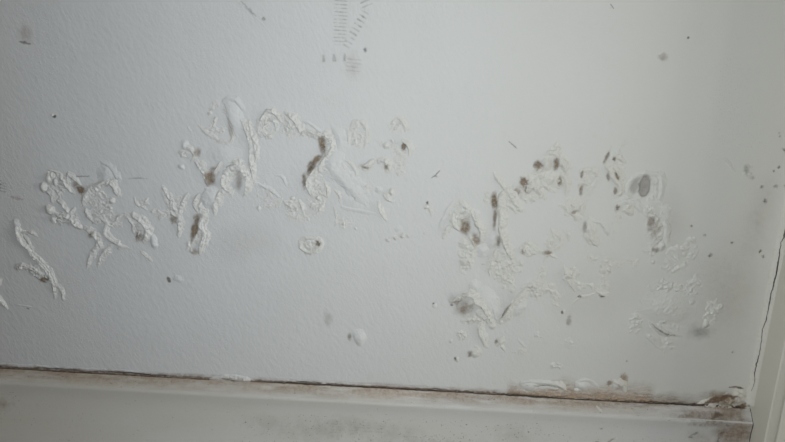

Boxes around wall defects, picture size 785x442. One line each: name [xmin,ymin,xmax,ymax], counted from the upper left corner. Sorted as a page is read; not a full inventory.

crack [1,367,209,380]
crack [251,231,785,442]